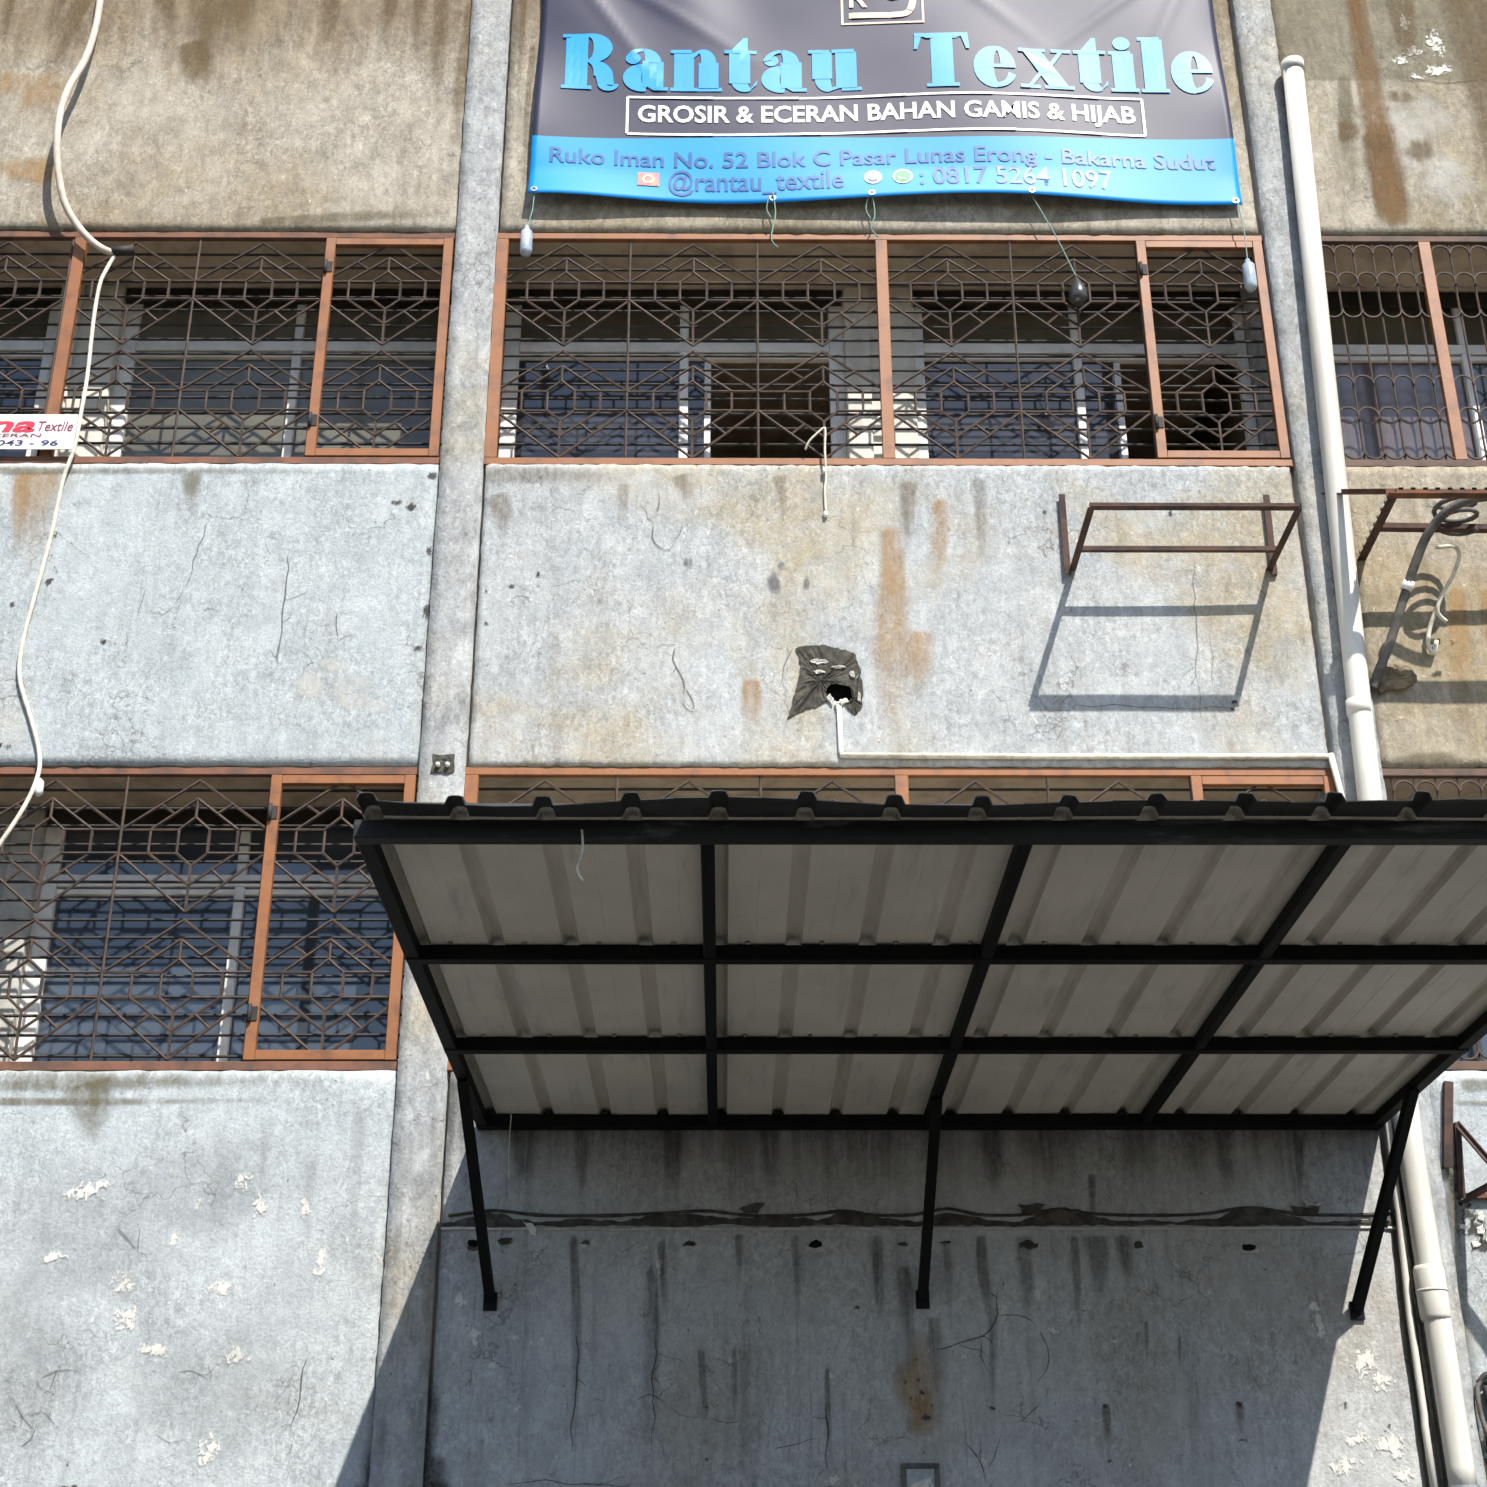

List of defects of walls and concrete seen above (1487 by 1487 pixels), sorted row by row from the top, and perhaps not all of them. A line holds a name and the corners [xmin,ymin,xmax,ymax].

damp [181,0,249,76]
damp [457,6,472,104]
peeling [1393,14,1453,79]
rust [1348,0,1406,223]
crack [514,1338,630,1487]
crack [639,1340,735,1446]
crack [940,1293,1050,1486]